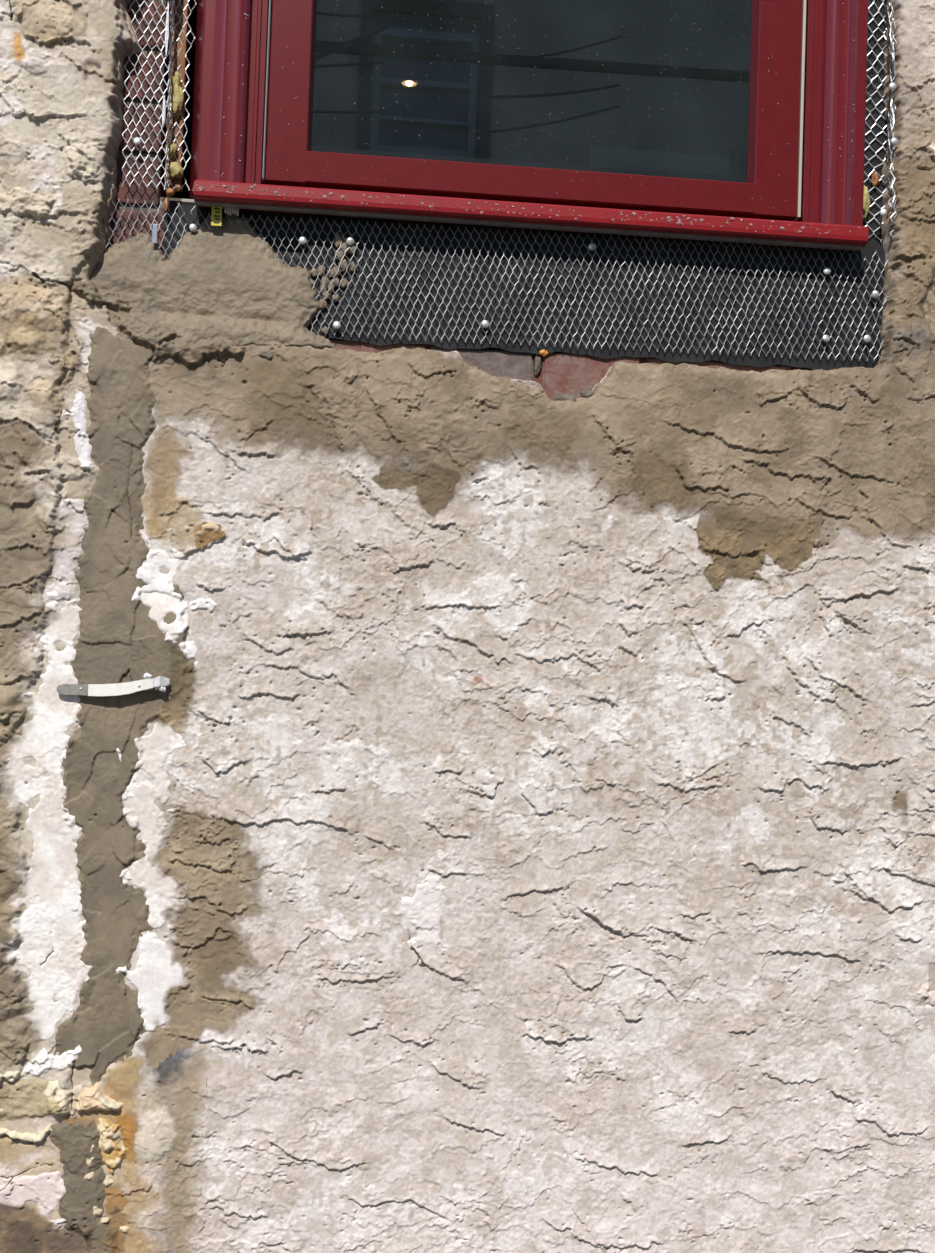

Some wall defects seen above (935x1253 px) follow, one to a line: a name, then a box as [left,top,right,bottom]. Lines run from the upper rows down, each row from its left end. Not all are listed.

spalling [329,338,791,402]
peeling [64,390,93,470]
peeling [131,521,226,672]
peeling [0,498,128,1187]
peeling [116,721,189,1031]
corrosion [113,1111,137,1159]
peeling [0,1171,67,1230]
spalling [93,1206,129,1234]